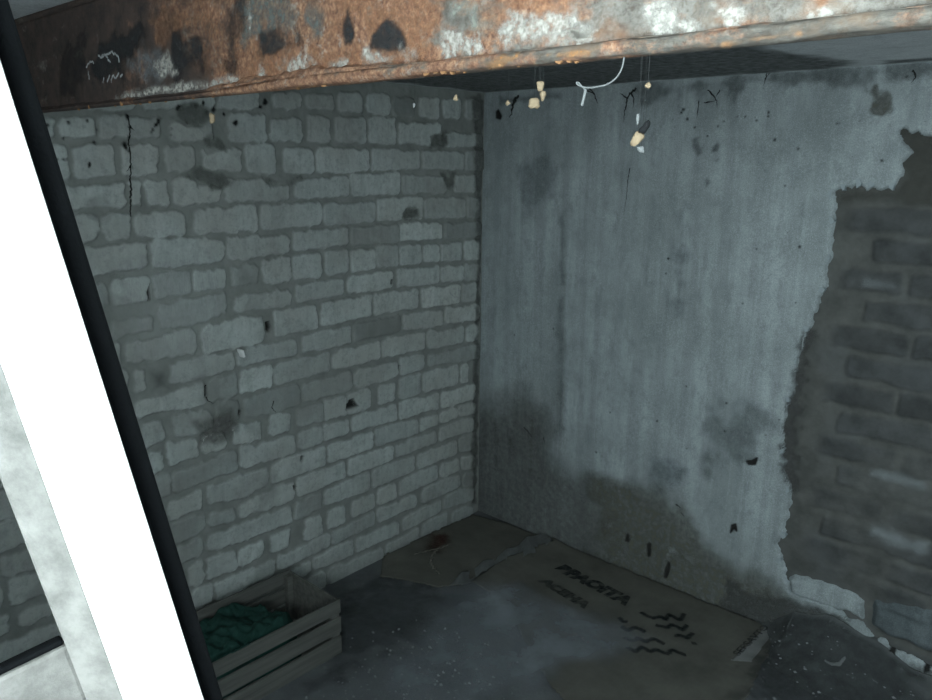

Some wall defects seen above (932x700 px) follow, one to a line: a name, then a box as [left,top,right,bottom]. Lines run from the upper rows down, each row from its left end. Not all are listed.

crack [127,115,135,217]
water stain [473,98,484,282]
crack [620,87,637,122]
water stain [471,340,848,625]
flaking render [776,129,932,672]